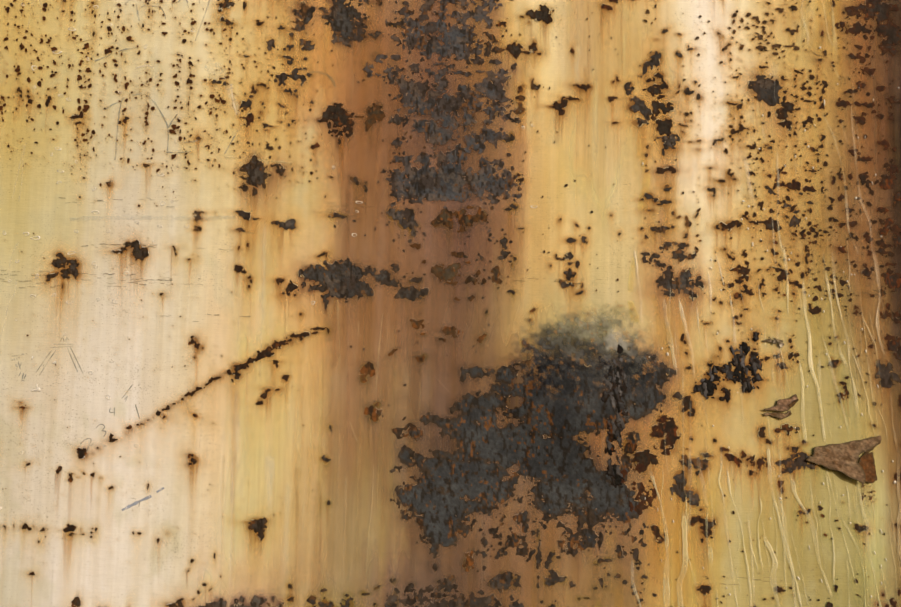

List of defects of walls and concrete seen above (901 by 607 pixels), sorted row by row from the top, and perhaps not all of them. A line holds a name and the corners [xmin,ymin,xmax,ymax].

peeling [354,0,539,294]
spalling [691,0,898,413]
rust [45,251,82,297]
rust [111,240,149,267]
rust [125,0,819,607]
rust [713,0,901,607]
peeling [392,417,413,439]
rust [56,466,114,490]
peeling [390,459,407,515]
rust [63,524,98,539]
peeling [456,460,660,573]
peeling [386,577,524,607]